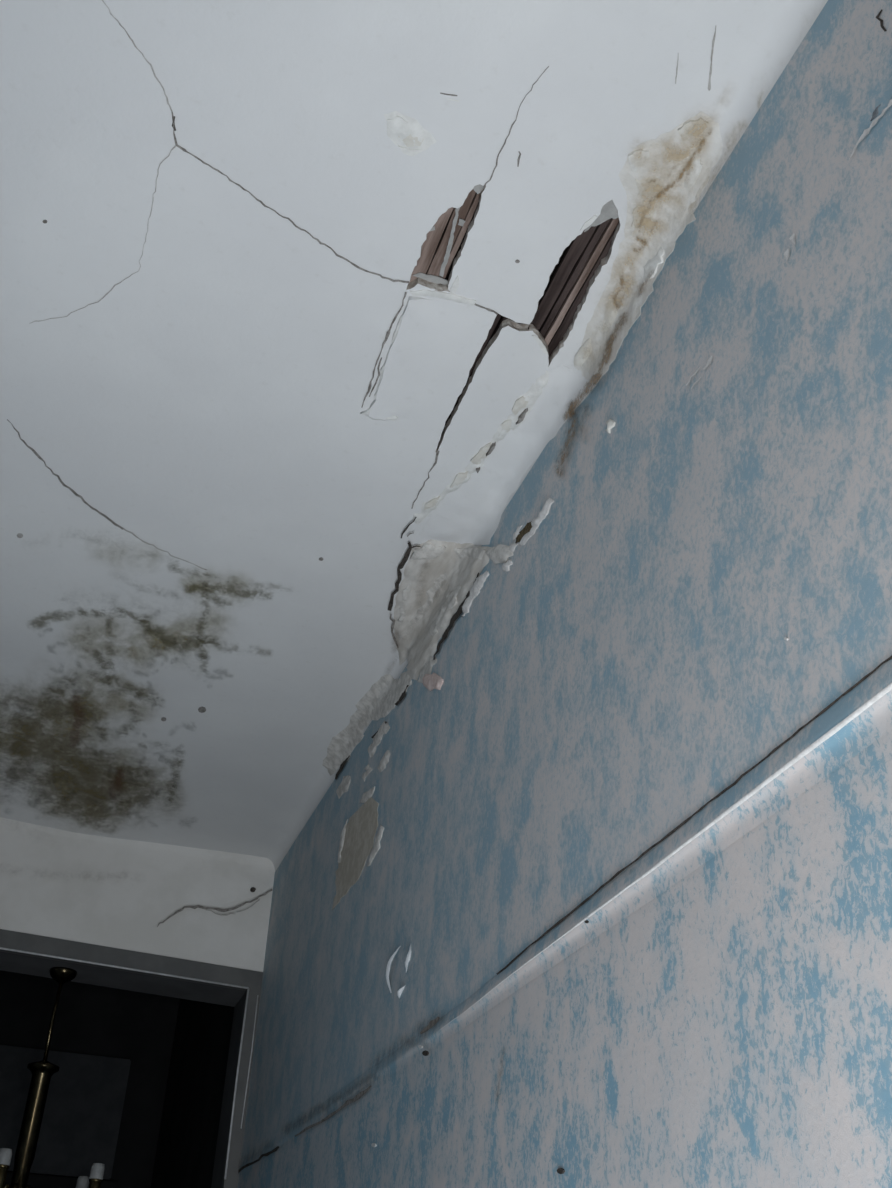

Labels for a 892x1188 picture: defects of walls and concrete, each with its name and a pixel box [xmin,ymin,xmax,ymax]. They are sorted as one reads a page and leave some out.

crack [29,0,409,408]
crack [483,66,549,188]
water stain [613,124,707,308]
peeling [406,112,723,526]
crack [7,419,207,570]
crack [388,303,529,660]
water stain [0,696,140,815]
crack [335,685,409,779]
spalling [323,539,513,798]
crack [157,889,272,927]